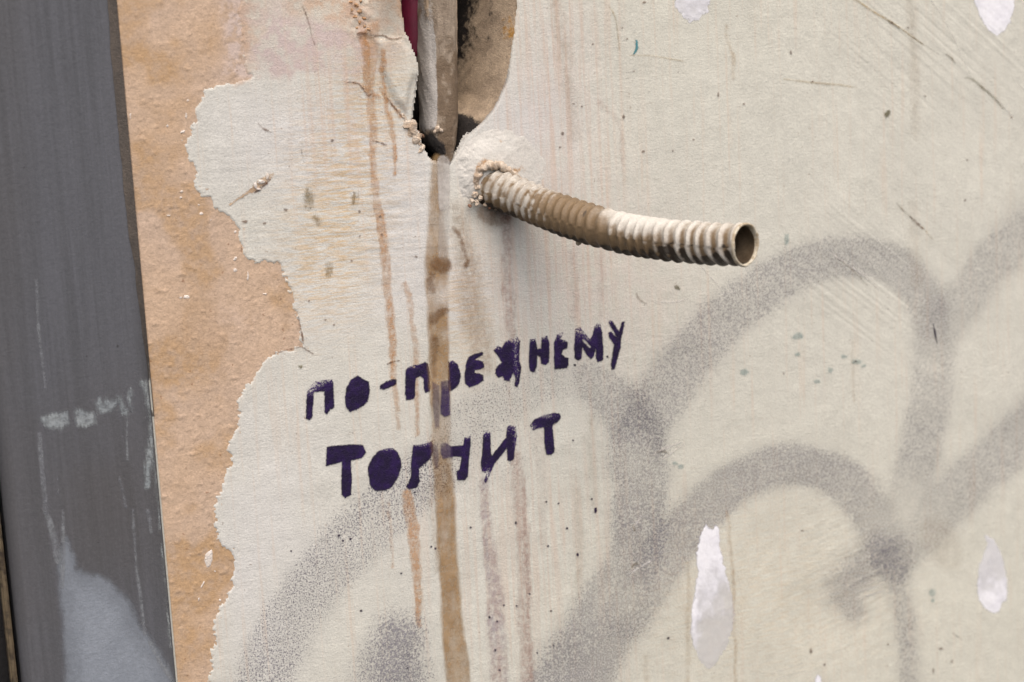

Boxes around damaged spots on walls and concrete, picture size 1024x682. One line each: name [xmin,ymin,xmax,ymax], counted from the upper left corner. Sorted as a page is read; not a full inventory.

spalling [398,83,436,160]
spalling [454,0,517,151]
peeling [60,0,309,682]
corrosion [404,490,421,625]